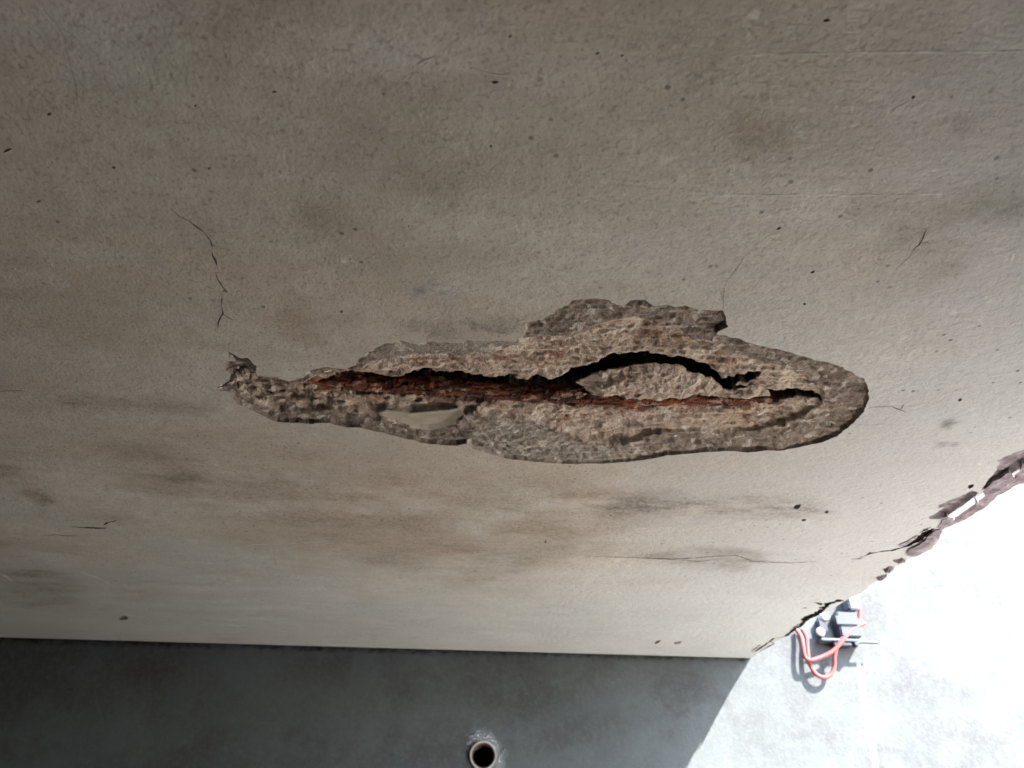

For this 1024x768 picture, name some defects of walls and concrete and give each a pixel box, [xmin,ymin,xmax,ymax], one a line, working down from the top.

crack [171,209,237,331]
spalling [220,298,869,464]
spalling [929,450,1024,534]
crack [595,555,816,563]
crack [857,527,940,559]
crack [751,599,844,653]